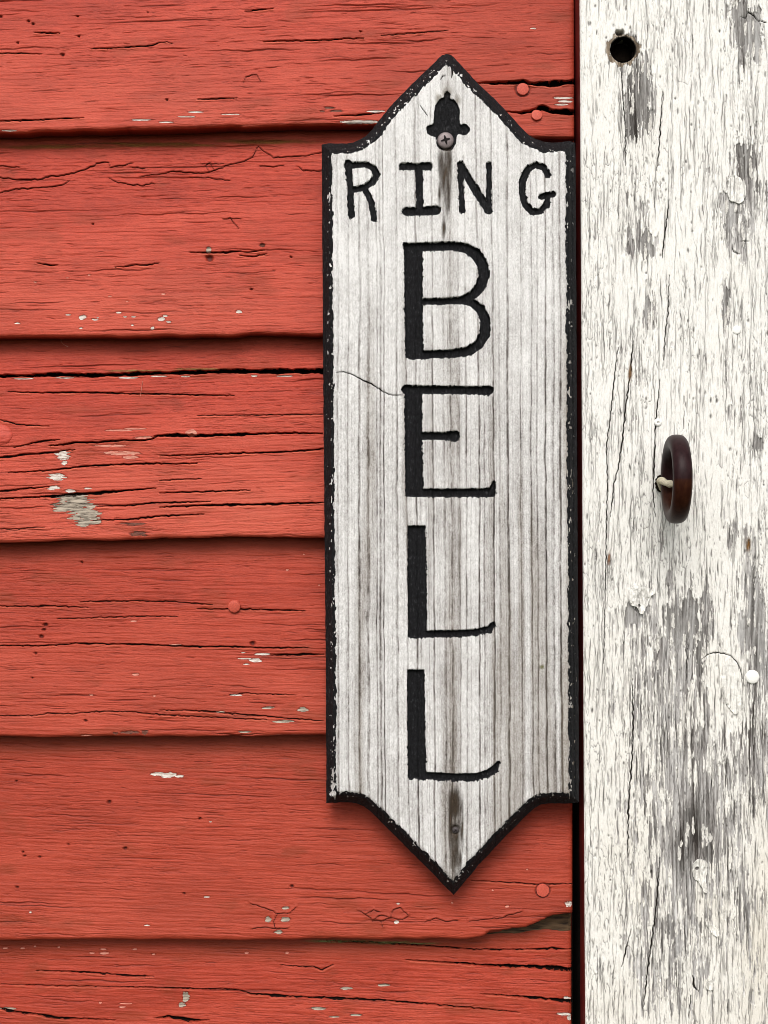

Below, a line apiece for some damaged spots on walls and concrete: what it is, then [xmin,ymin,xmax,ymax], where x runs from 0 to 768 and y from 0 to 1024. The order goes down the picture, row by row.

peeling [606,34,653,143]
crack [2,146,320,193]
peeling [723,143,757,249]
peeling [47,451,102,527]
crack [0,368,398,521]
crack [603,344,633,663]
peeling [625,585,655,628]
peeling [656,588,711,681]
peeling [721,563,766,714]
crack [626,687,634,851]
crack [344,908,571,972]
crack [621,858,660,999]